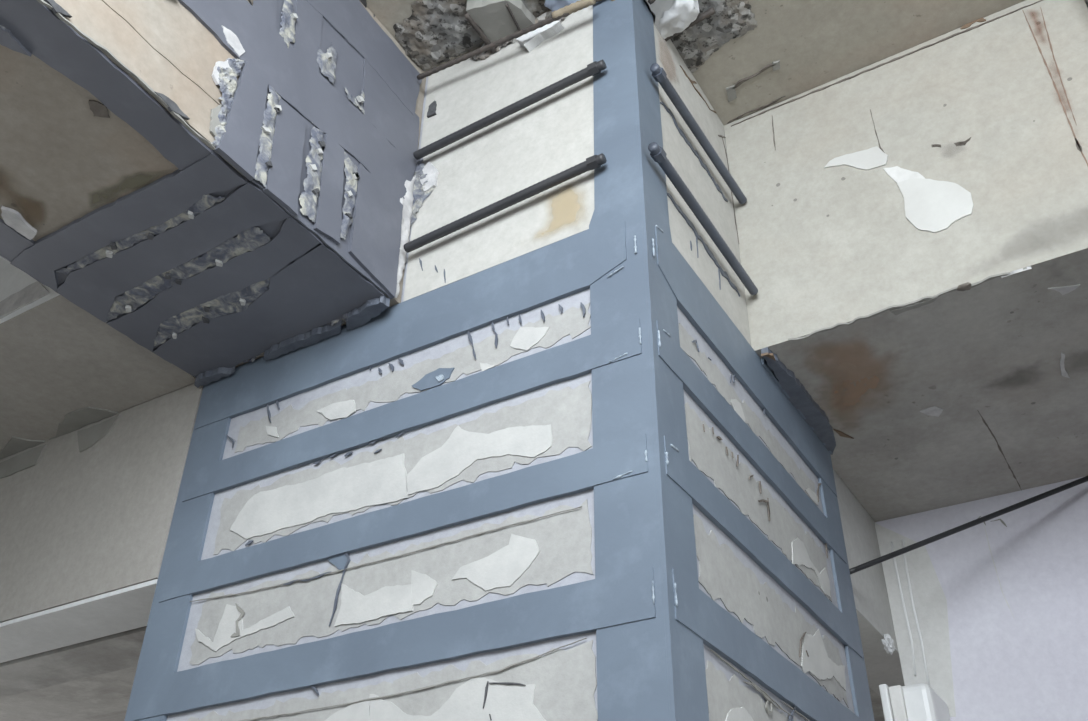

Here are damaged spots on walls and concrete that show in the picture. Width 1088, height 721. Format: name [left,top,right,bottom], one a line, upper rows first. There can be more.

spalling [393,0,615,80]
spalling [659,0,758,74]
corrosion [1023,7,1088,166]
peeling [308,141,326,170]
peeling [883,166,973,233]
peeling [264,162,439,361]